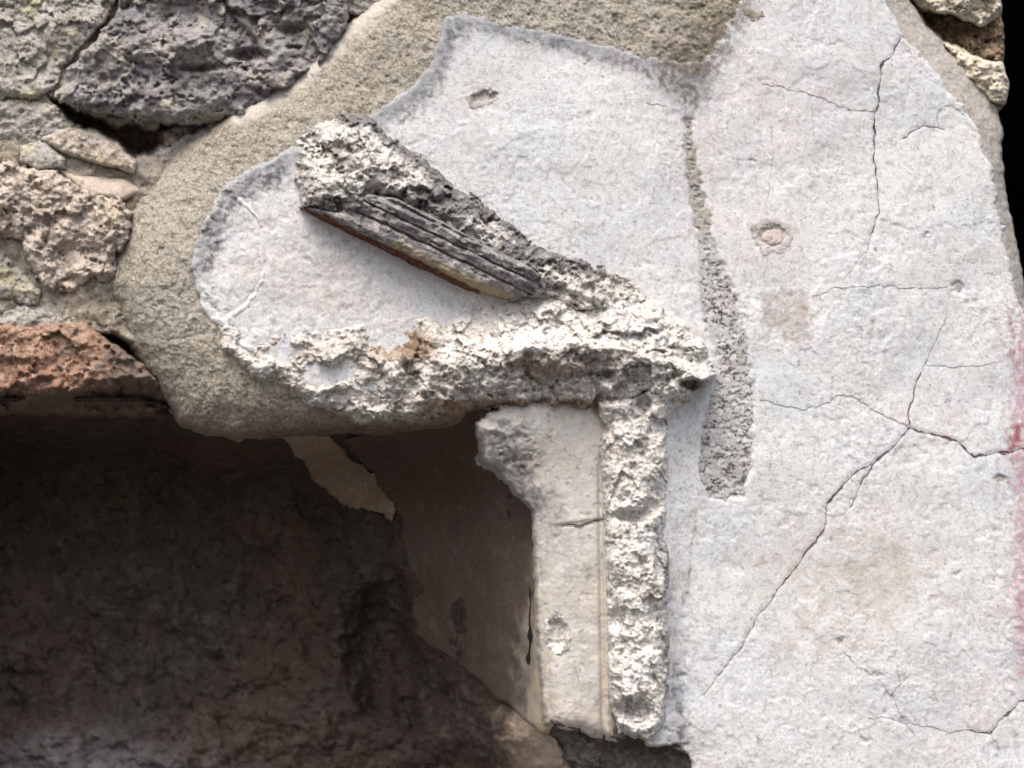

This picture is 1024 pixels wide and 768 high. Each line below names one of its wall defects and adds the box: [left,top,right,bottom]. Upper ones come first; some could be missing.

crack [769,41,899,252]
crack [708,328,1024,688]
crack [850,656,1024,734]